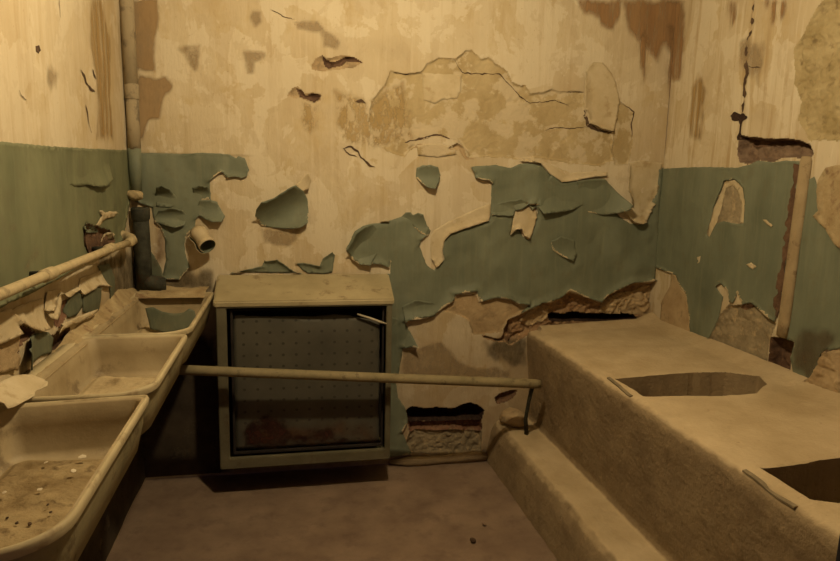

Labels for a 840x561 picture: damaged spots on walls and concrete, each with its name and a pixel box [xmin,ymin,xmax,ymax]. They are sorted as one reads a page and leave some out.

damp [580,0,620,28]
spalling [312,55,362,71]
crack [731,5,760,140]
crack [343,146,374,167]
peeling [255,174,311,229]
peeling [346,0,840,457]
peeling [0,141,249,409]